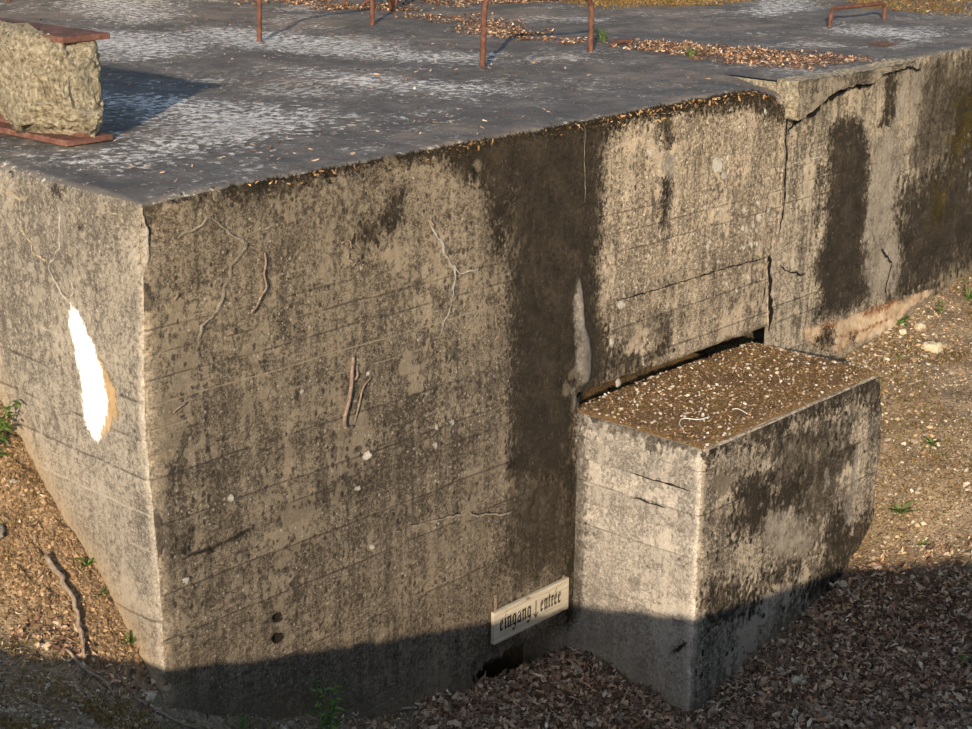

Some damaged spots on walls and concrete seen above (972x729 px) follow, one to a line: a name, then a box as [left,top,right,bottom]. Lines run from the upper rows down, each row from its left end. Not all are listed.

crack [142,0,972,377]
damp [480,122,676,631]
damp [656,109,679,236]
damp [696,409,874,638]